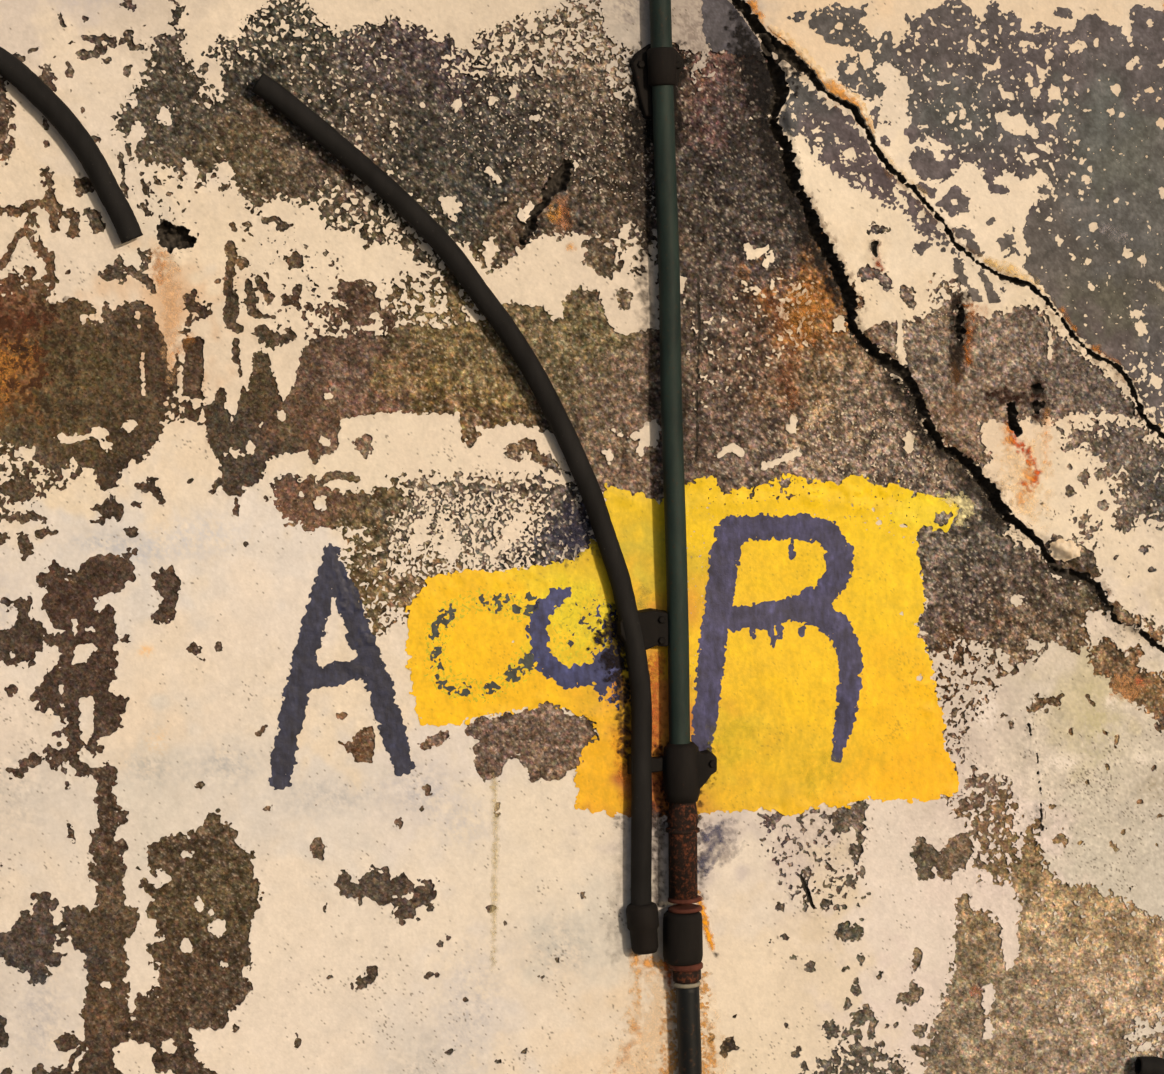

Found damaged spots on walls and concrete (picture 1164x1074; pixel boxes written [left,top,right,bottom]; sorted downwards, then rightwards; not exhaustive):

peeling [792,11,807,23]
peeling [1053,7,1073,19]
corrosion [0,294,80,424]
crack [732,0,1164,653]
corrosion [985,379,1044,423]
corrosion [1006,423,1040,486]
spalling [0,0,664,1074]
spalling [672,42,1164,1074]
corrosion [668,890,717,956]